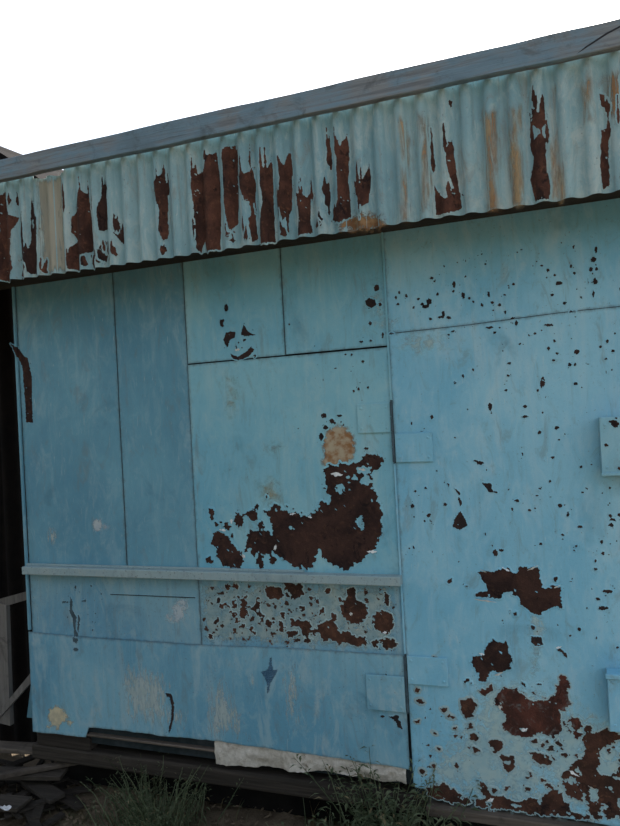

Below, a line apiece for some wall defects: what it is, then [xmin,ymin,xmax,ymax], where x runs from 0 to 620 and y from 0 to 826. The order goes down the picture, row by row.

rust [607,73,620,116]
rust [485,112,497,209]
rust [38,178,65,272]
rust [338,211,386,233]
rust [322,426,355,466]